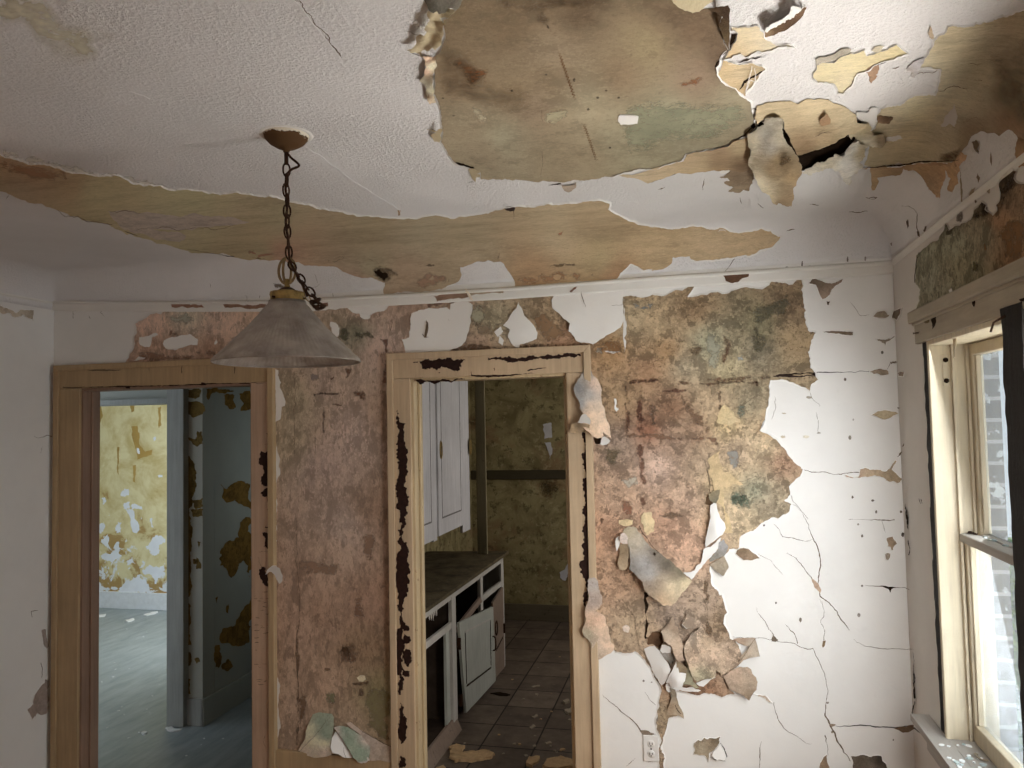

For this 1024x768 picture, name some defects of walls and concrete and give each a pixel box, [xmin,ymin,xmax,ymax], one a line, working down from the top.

crack [294,0,342,59]
peeling [718,24,795,96]
peeling [812,44,909,96]
peeling [864,9,1024,203]
peeling [619,117,802,207]
peeling [434,291,504,301]
peeling [723,274,749,283]
peeling [569,369,614,660]
crack [805,444,922,555]
peeling [298,413,412,768]
peeling [615,490,773,721]
crack [736,496,920,761]